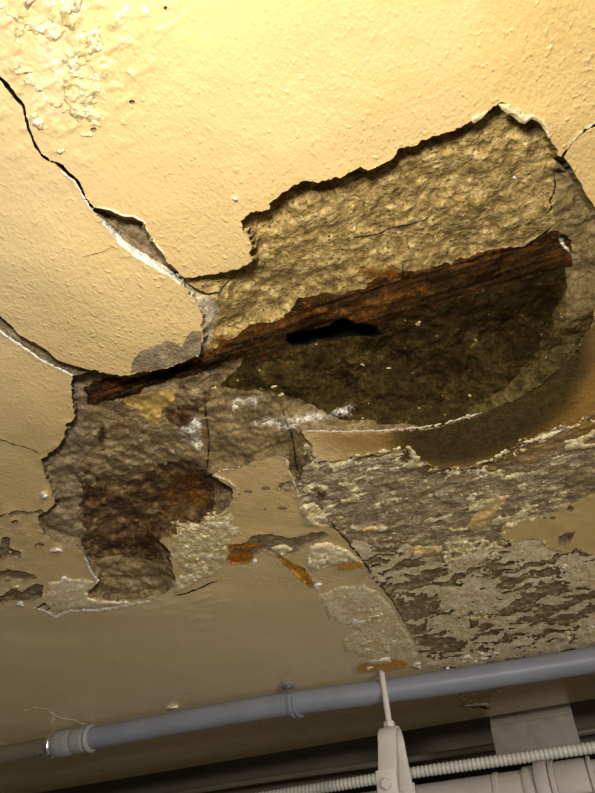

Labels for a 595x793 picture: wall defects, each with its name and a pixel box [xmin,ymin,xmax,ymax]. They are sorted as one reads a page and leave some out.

crack [561,122,595,157]
crack [0,76,185,287]
crack [0,316,90,376]
spalling [0,102,595,671]
corrosion [227,542,262,564]
corrosion [279,558,314,586]
corrosion [357,658,409,672]